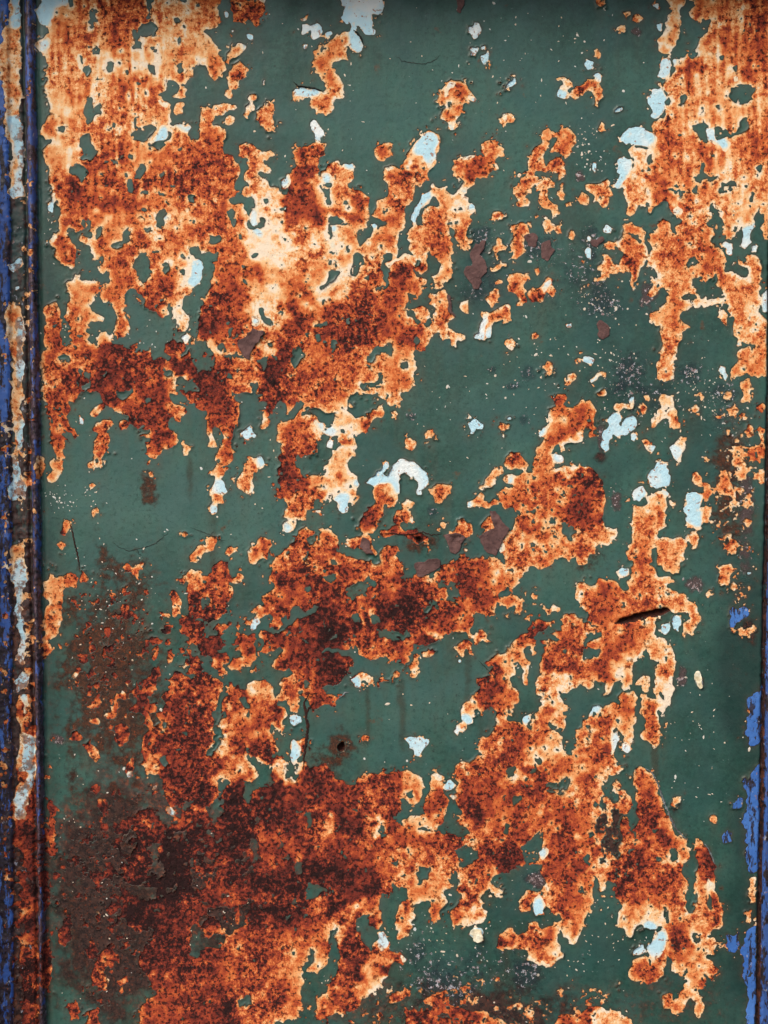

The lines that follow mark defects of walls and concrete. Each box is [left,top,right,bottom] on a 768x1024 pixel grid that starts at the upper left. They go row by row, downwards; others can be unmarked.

peeling [7,257,24,272]
corrosion [0,0,509,535]
peeling [600,396,638,452]
corrosion [511,0,768,418]
corrosion [0,394,765,1024]